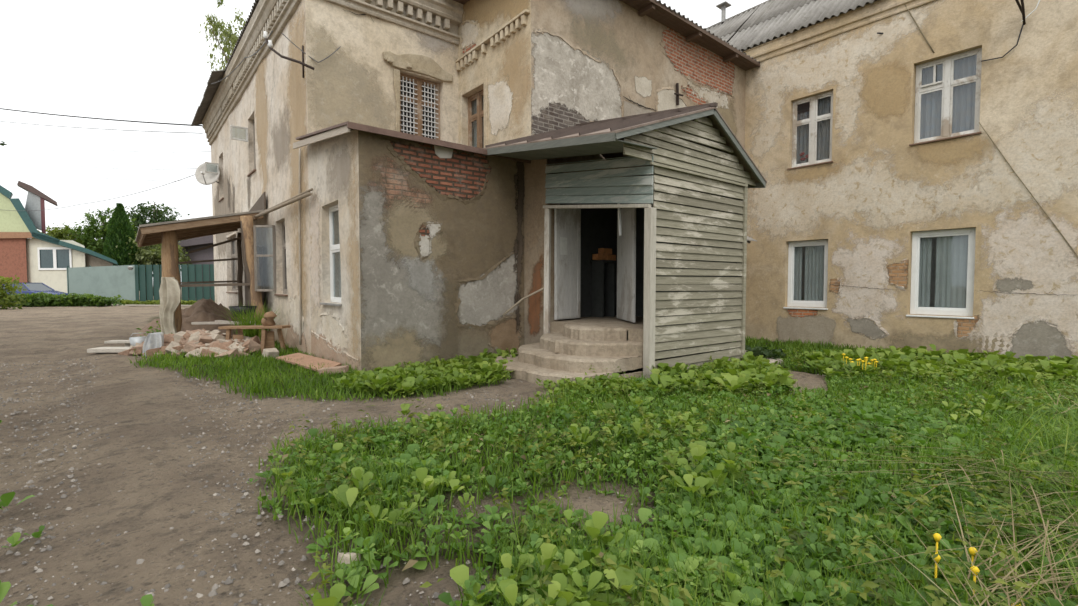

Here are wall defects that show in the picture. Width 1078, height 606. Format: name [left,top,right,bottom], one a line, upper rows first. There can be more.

peeling [531,28,624,135]
flaking render [655,26,736,112]
peeling [286,28,523,370]
flaking render [884,258,909,291]